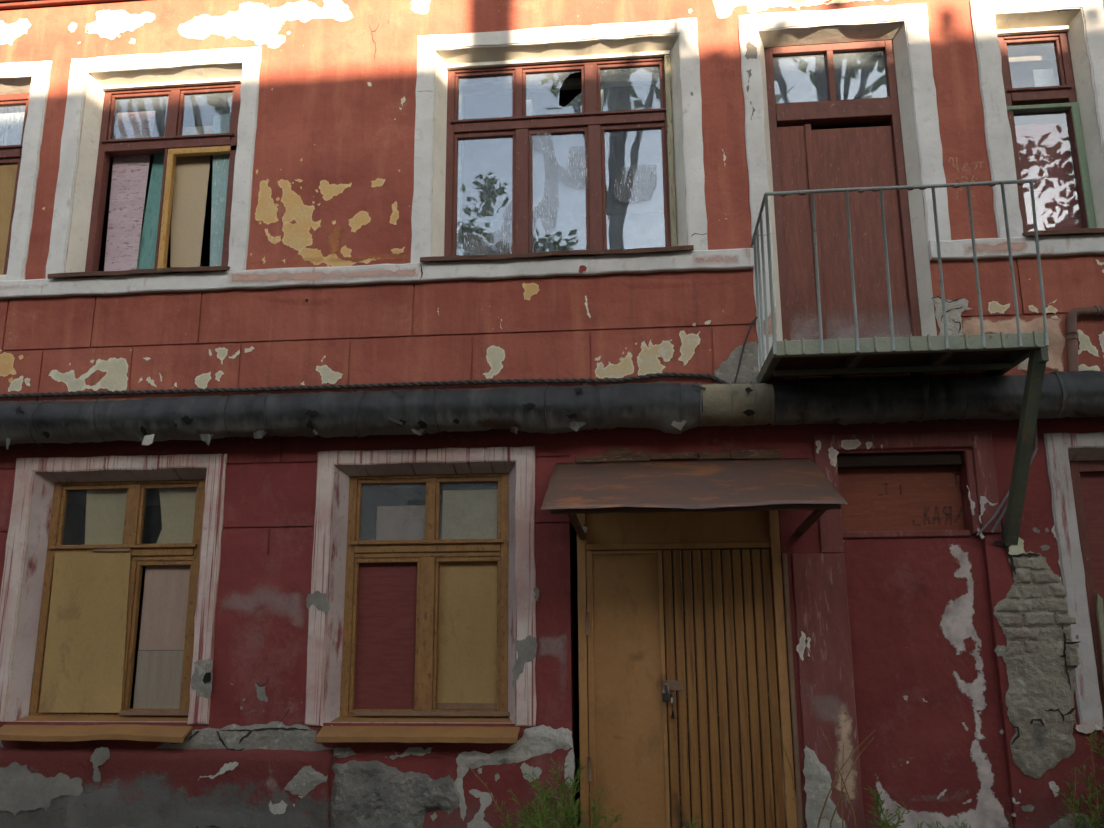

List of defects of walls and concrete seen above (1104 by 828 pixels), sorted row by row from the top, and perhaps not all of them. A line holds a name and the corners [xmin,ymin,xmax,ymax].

peeling [178,0,353,48]
peeling [713,0,888,120]
peeling [255,169,405,267]
peeling [0,349,30,392]
peeling [48,350,177,392]
peeling [195,346,254,389]
peeling [583,320,711,386]
peeling [1077,329,1104,371]
flaking render [993,525,1080,797]
peeling [0,746,110,816]
spalling [156,721,573,828]
spalling [803,746,845,828]